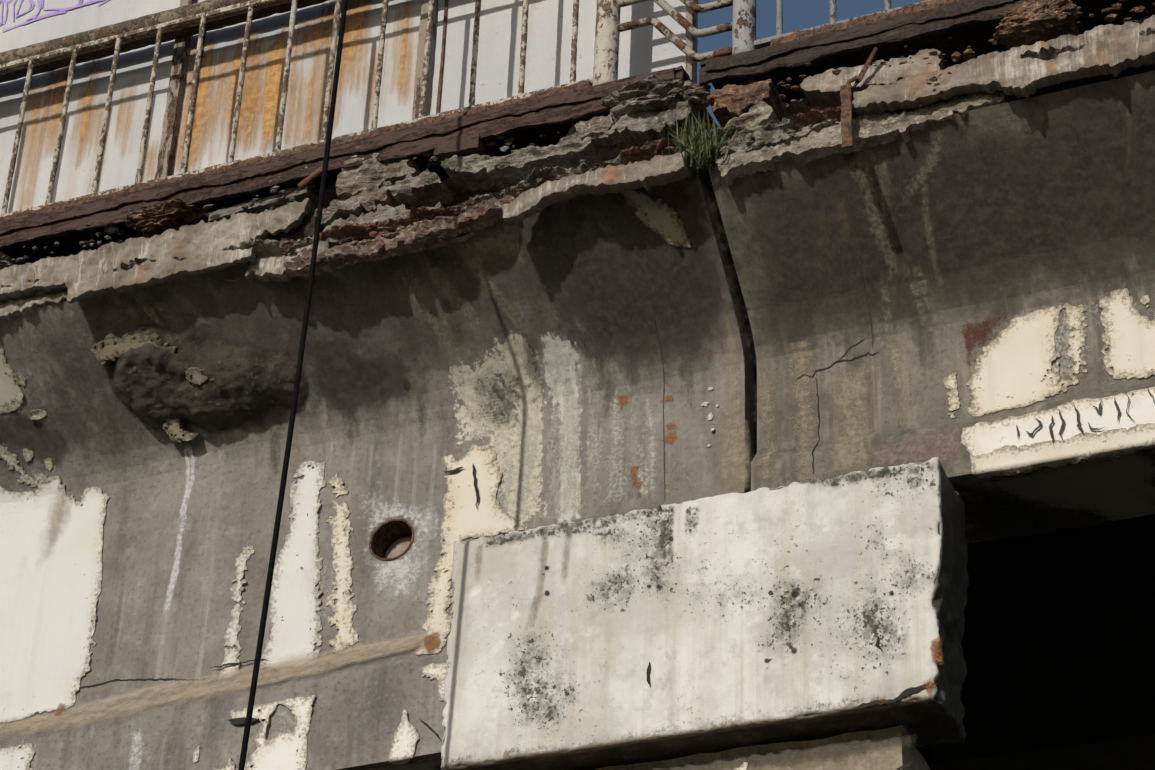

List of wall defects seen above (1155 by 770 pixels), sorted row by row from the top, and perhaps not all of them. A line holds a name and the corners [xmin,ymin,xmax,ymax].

spalling [79,37,982,276]
peeling [0,445,110,724]
water stain [165,445,195,610]
water stain [0,633,433,733]
peeling [260,461,359,670]
water stain [0,187,747,497]
peeling [415,330,583,701]
mould [499,621,579,734]
water stain [584,474,941,674]
crack [794,272,879,475]
peeling [943,288,1155,521]
crack [1016,386,1155,443]